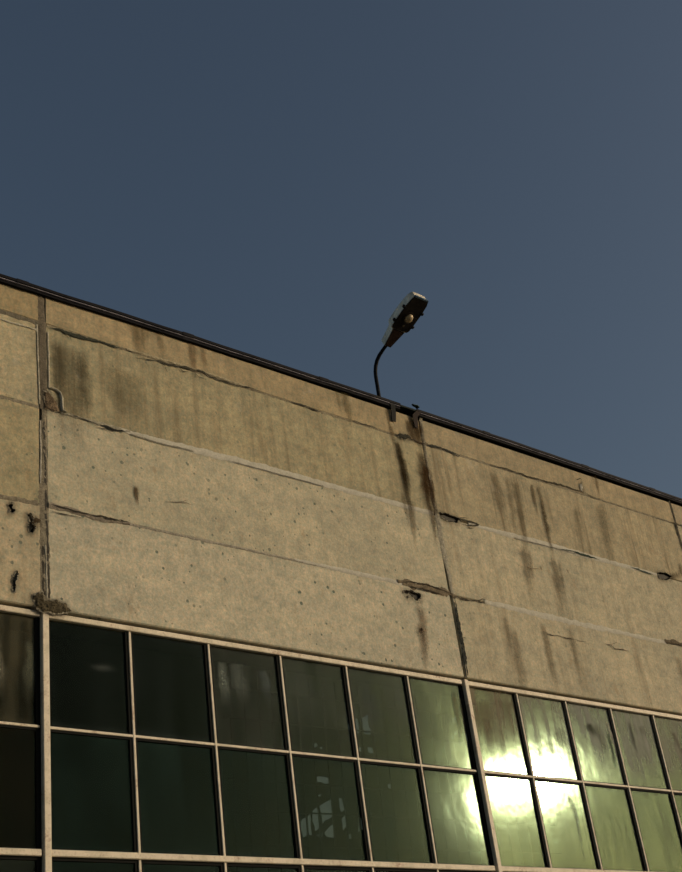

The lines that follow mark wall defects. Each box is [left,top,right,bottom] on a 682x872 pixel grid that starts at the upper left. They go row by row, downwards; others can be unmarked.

crack [410,437,461,457]
rust [392,432,410,502]
rust [420,457,434,503]
spalling [7,502,42,534]
spalling [10,570,19,593]